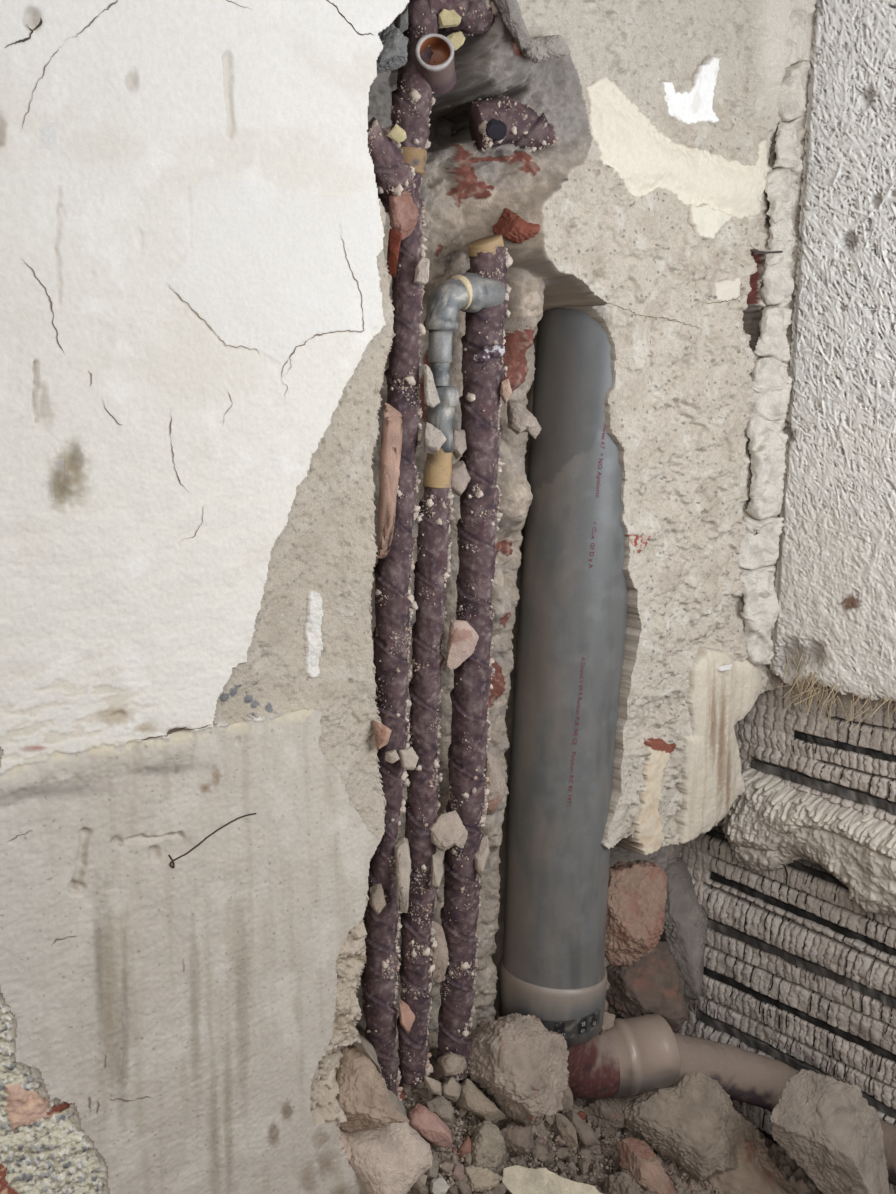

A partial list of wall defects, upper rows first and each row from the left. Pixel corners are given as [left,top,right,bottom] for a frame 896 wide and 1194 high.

crack [5,18,42,48]
crack [21,0,118,131]
crack [327,0,373,35]
spalling [367,2,409,133]
spalling [414,0,817,1036]
spalling [213,156,419,1175]
spalling [0,986,110,1194]